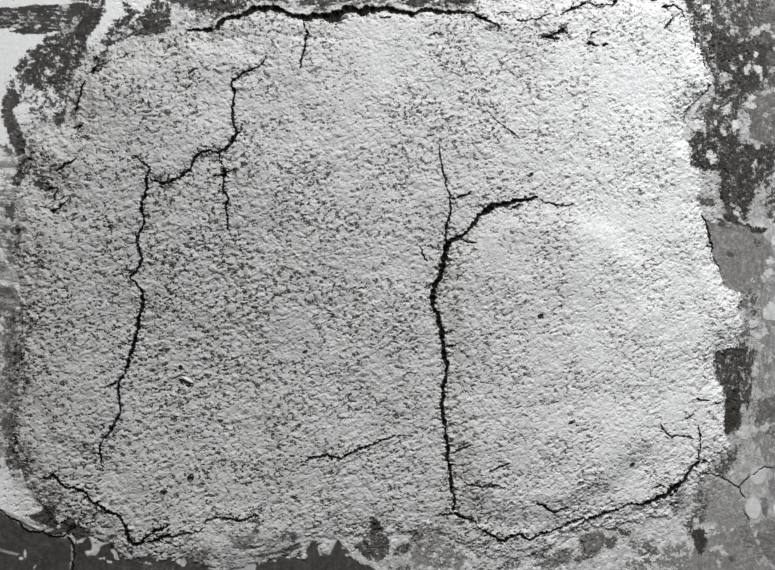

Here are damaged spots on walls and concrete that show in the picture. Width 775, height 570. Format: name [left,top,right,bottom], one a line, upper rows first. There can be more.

crack [185,0,618,70]
crack [74,53,129,128]
crack [99,56,266,465]
crack [419,145,772,543]
crack [305,435,411,462]
crack [40,474,260,546]